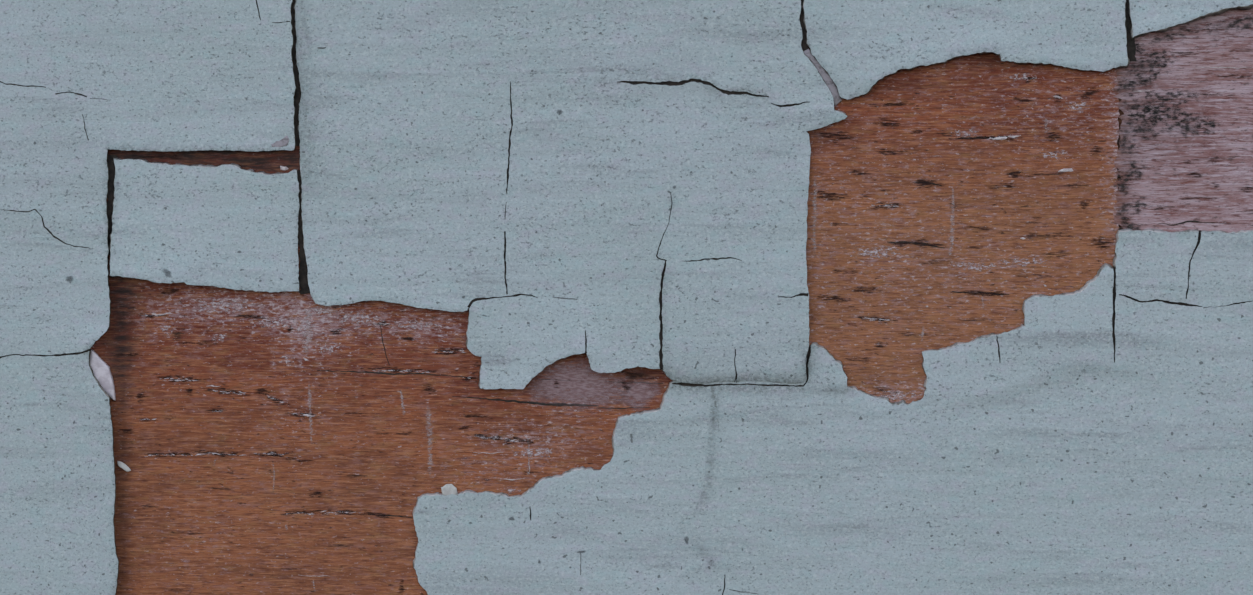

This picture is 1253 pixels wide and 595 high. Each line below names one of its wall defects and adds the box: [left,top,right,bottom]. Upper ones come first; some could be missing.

crack [0,349,91,358]
crack [0,81,117,278]
crack [256,0,326,294]
peeling [89,136,673,595]
crack [467,82,577,308]
crack [618,0,842,107]
crack [656,196,811,387]
peeling [806,8,1253,404]
crack [1125,0,1136,61]
crack [1112,230,1252,363]